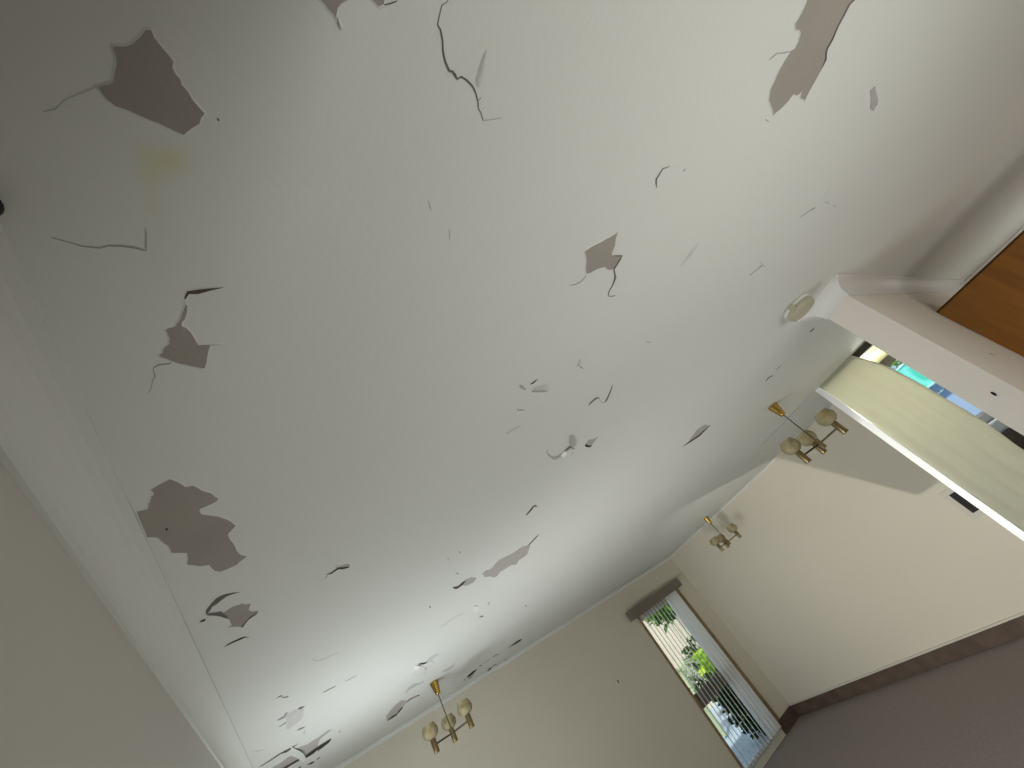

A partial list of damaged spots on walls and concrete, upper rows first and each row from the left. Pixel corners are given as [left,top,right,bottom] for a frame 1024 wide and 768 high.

peeling [319,0,350,30]
peeling [43,27,220,137]
crack [437,1,500,121]
peeling [766,0,855,122]
crack [51,229,147,251]
peeling [570,230,623,297]
peeling [149,287,226,392]
peeling [135,478,248,572]
peeling [453,534,539,589]
peeling [199,592,259,629]
peeling [386,695,420,721]
peeling [273,730,341,768]